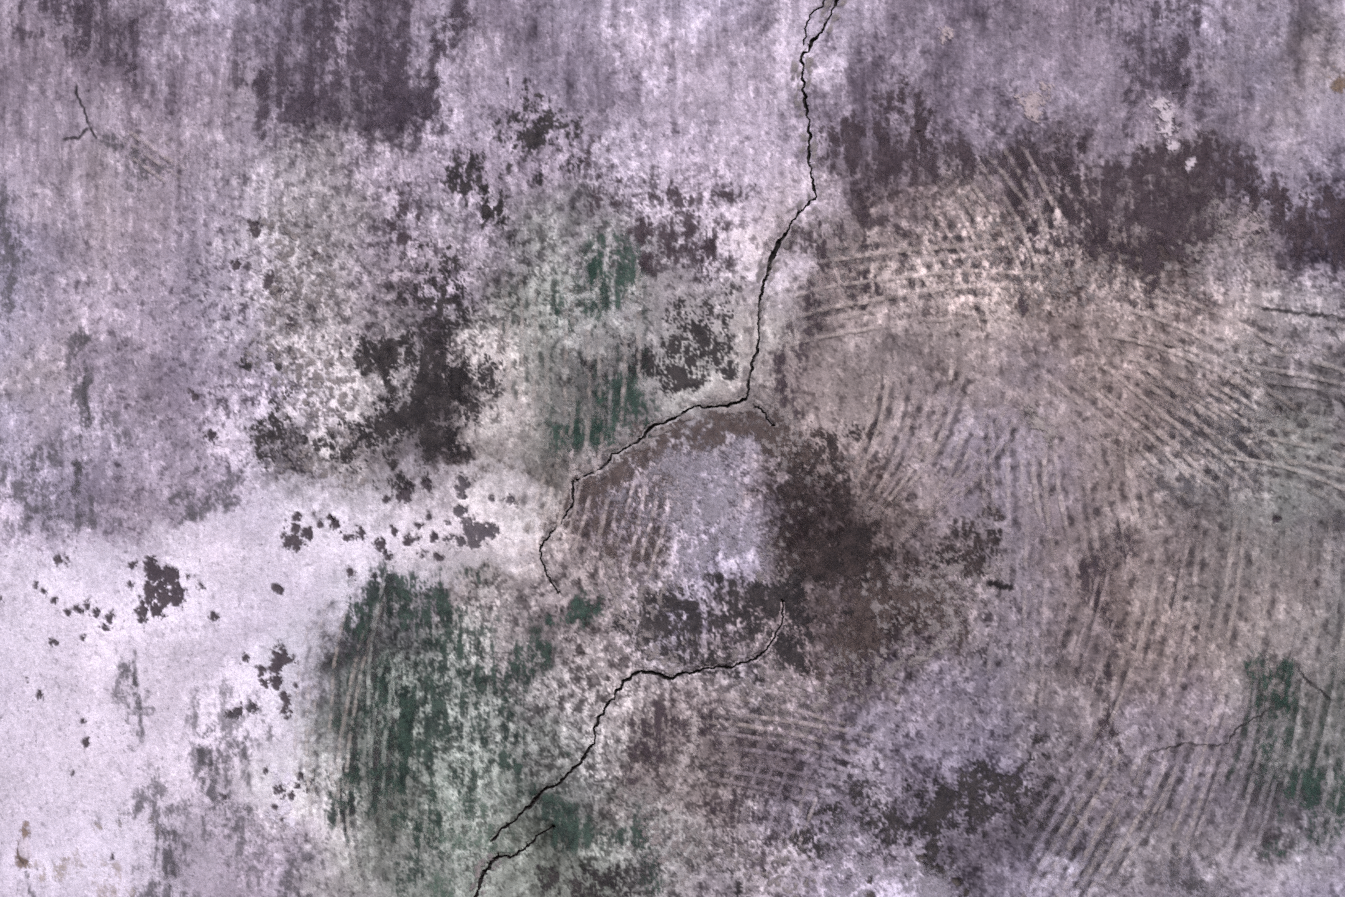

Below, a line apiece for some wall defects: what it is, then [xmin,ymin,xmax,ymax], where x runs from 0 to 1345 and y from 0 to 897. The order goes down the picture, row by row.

leakage [440,78,756,393]
crack [537,0,847,593]
leakage [554,0,1345,692]
crack [470,602,786,897]